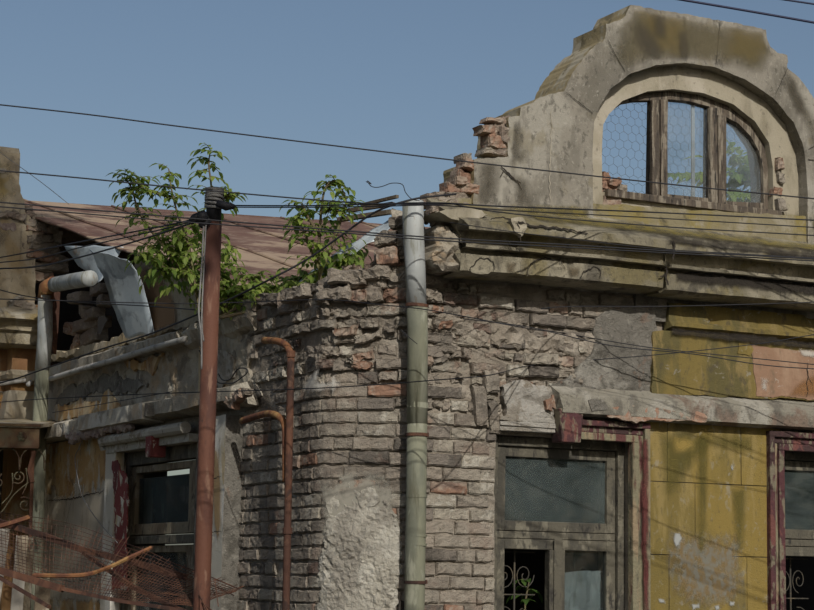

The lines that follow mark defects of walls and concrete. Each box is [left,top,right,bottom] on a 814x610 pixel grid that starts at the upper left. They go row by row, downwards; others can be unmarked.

spalling [420,115,510,231]
spalling [769,157,788,212]
spalling [0,205,85,309]
spalling [224,208,407,610]
spalling [425,257,634,610]
peeling [43,460,130,603]